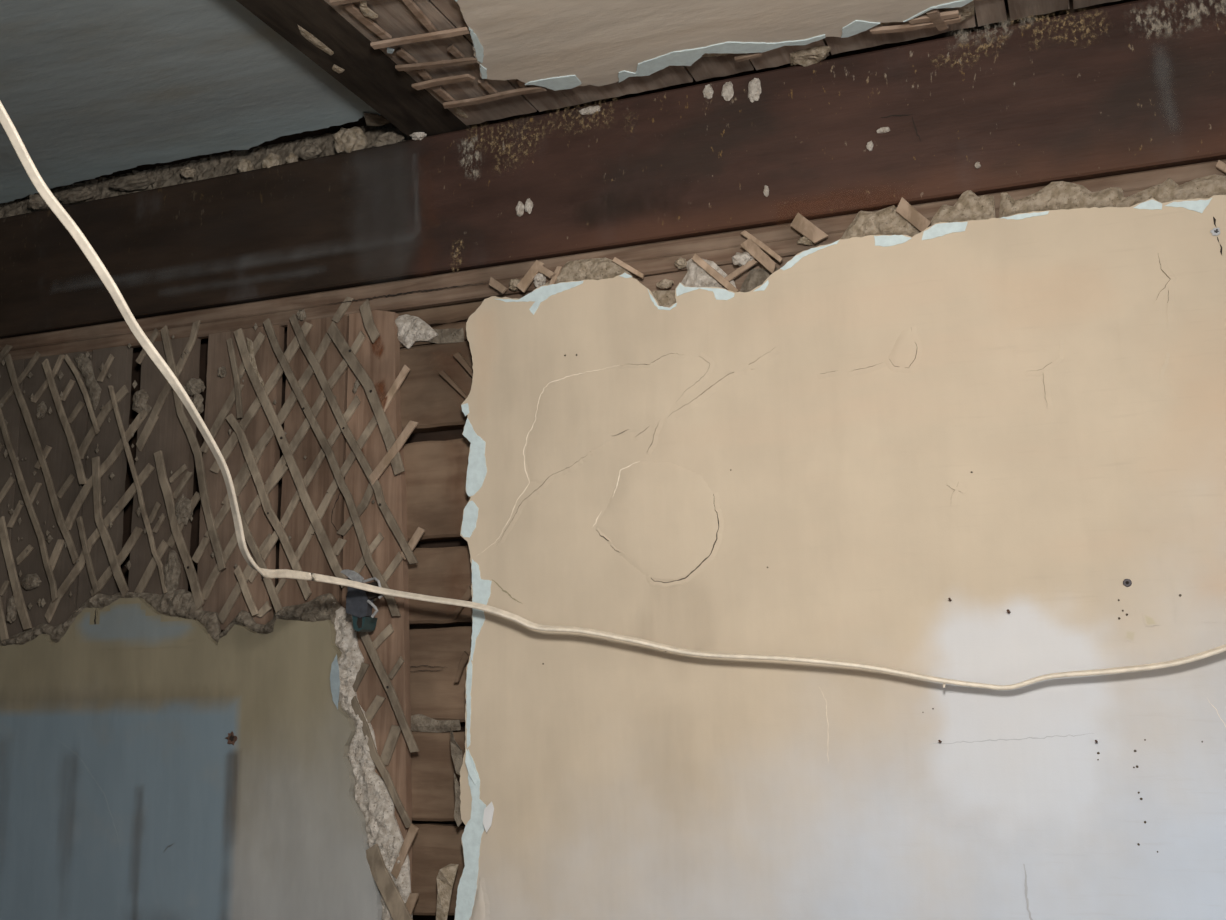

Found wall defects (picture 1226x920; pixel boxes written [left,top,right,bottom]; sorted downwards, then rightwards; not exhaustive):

peeling [618,34,826,83]
spalling [703,78,761,103]
corrosion [1012,13,1105,42]
spalling [0,131,344,218]
corrosion [471,103,612,170]
spalling [647,174,1226,310]
spalling [496,258,635,315]
crack [1154,252,1177,329]
crack [646,492,724,588]
spalling [0,589,412,920]
peeling [436,559,494,920]
crack [1023,864,1033,920]